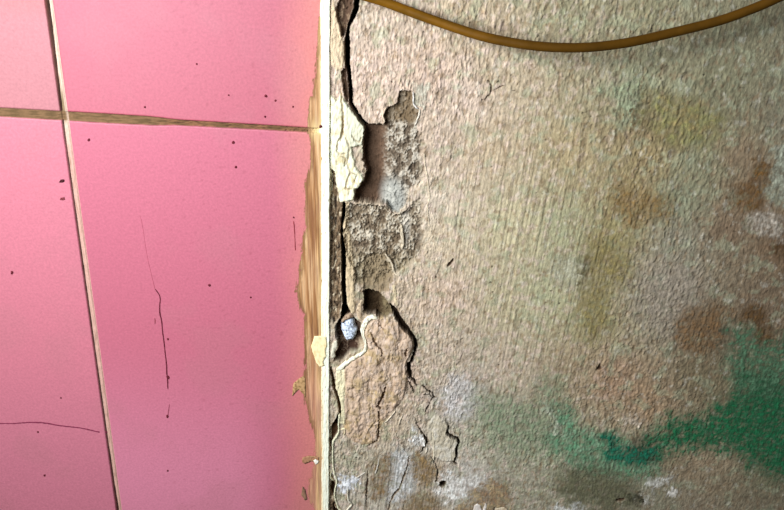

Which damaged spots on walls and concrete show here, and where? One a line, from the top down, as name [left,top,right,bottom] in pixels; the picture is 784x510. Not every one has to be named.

crack [336,0,384,127]
crack [140,217,170,414]
crack [330,169,351,325]
spalling [311,89,430,367]
crack [0,422,107,433]
crack [329,366,369,510]
crack [387,302,440,510]
water stain [478,323,784,497]